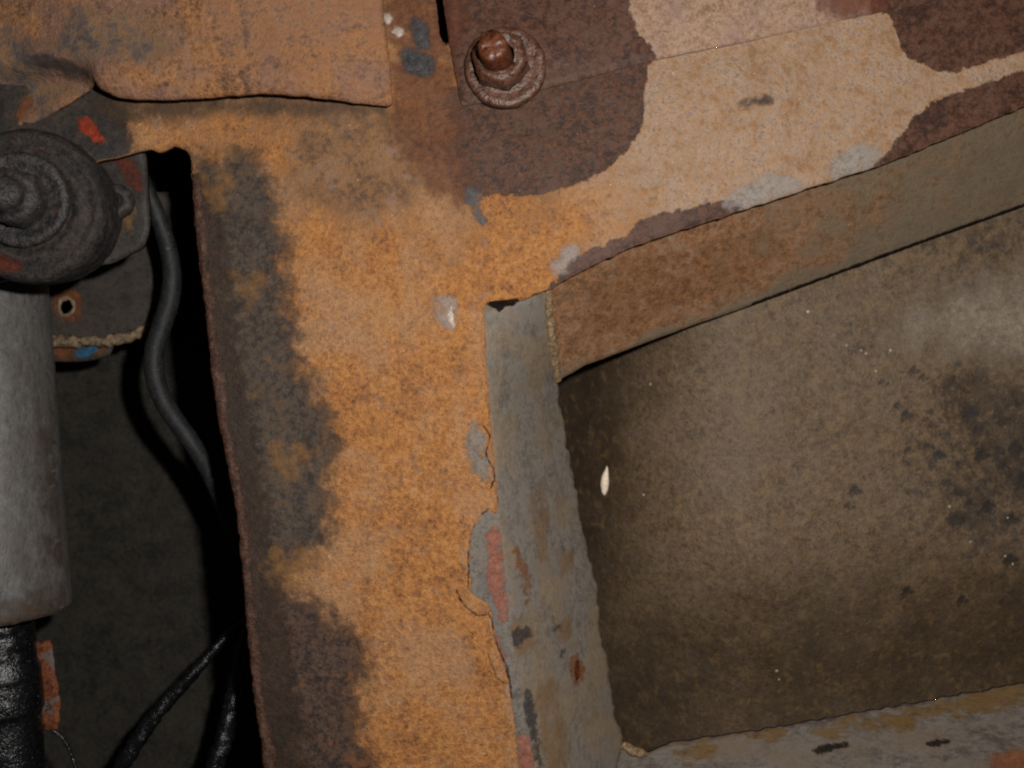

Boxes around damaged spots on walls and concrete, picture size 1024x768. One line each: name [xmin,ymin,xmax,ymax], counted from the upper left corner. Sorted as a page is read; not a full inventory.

rust [384,0,470,200]
rust [874,70,1024,167]
peeling [456,421,542,768]